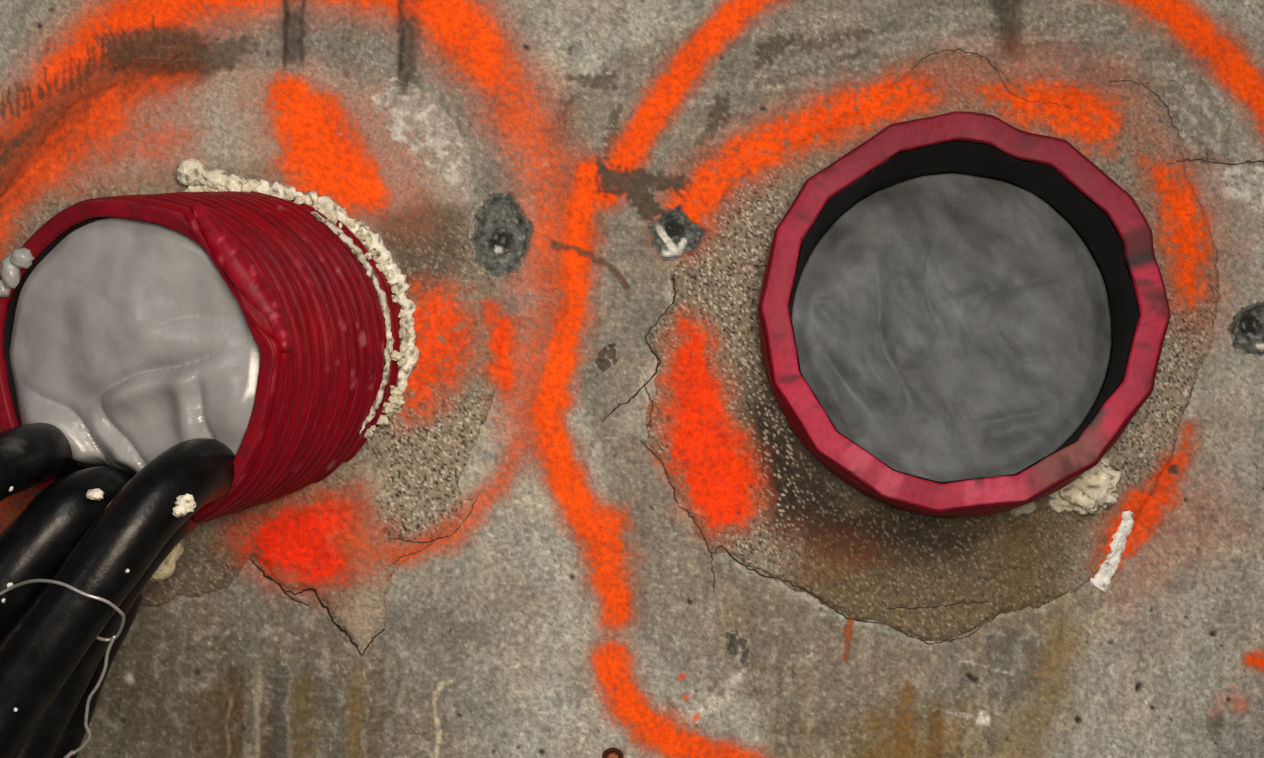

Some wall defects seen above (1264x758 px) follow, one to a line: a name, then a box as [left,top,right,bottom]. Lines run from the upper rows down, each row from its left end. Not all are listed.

crack [911,48,1071,109]
crack [1108,80,1264,165]